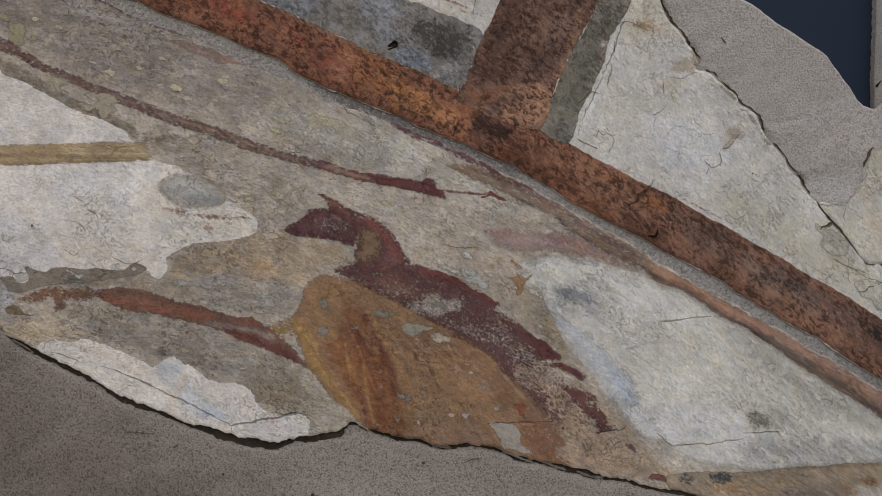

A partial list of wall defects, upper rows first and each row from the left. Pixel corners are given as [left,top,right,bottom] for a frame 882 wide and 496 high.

crack [661,0,882,266]
crack [1,328,696,496]